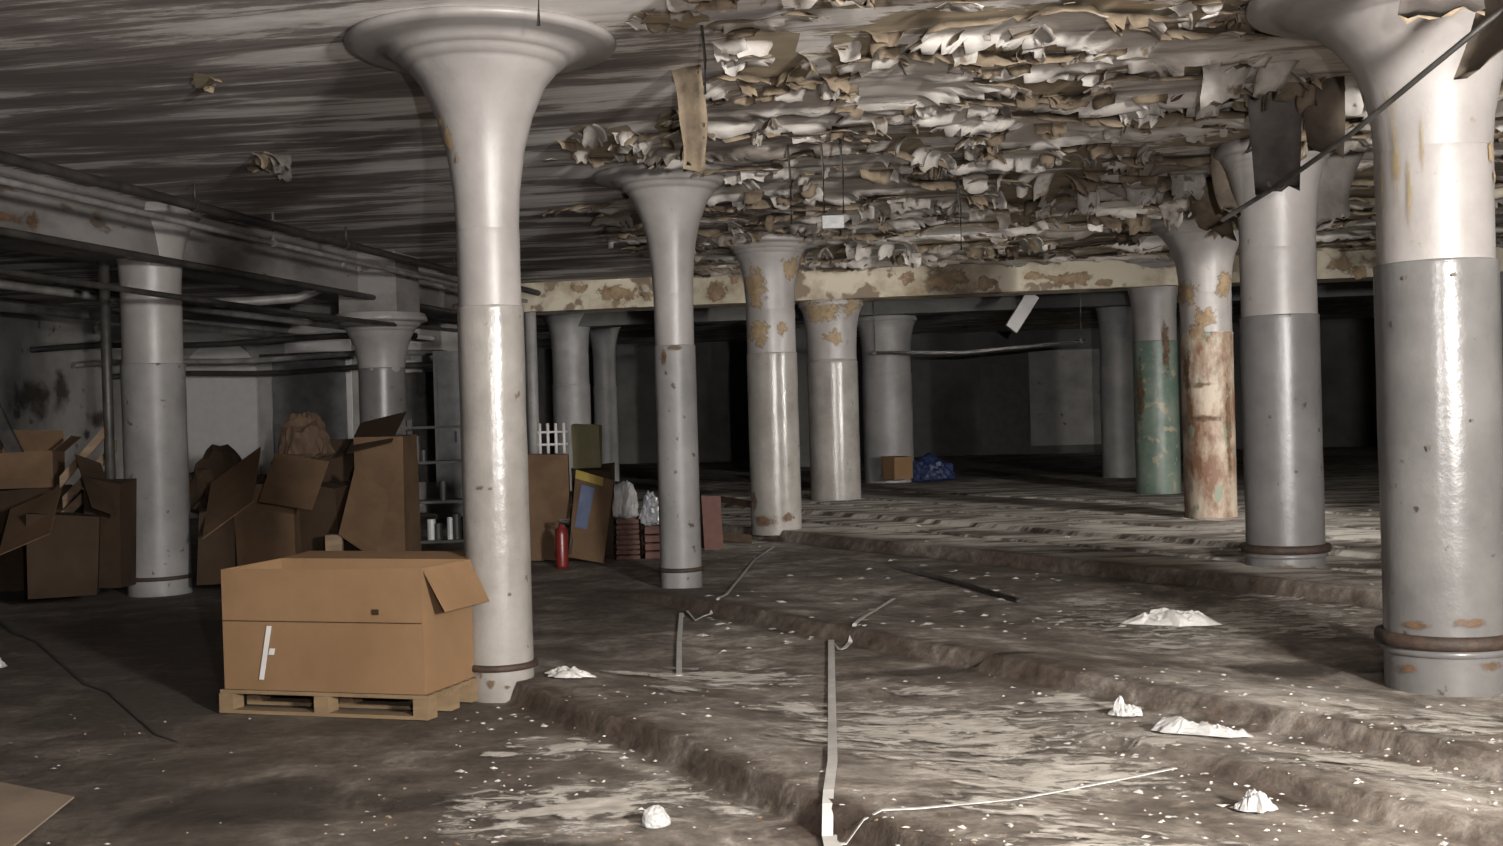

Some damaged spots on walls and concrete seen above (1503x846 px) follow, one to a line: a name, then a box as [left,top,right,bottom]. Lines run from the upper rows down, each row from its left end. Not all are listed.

peeling [1398,0,1503,80]
peeling [542,0,1376,348]
peeling [1488,80,1503,244]
corrosion [1183,354,1232,473]